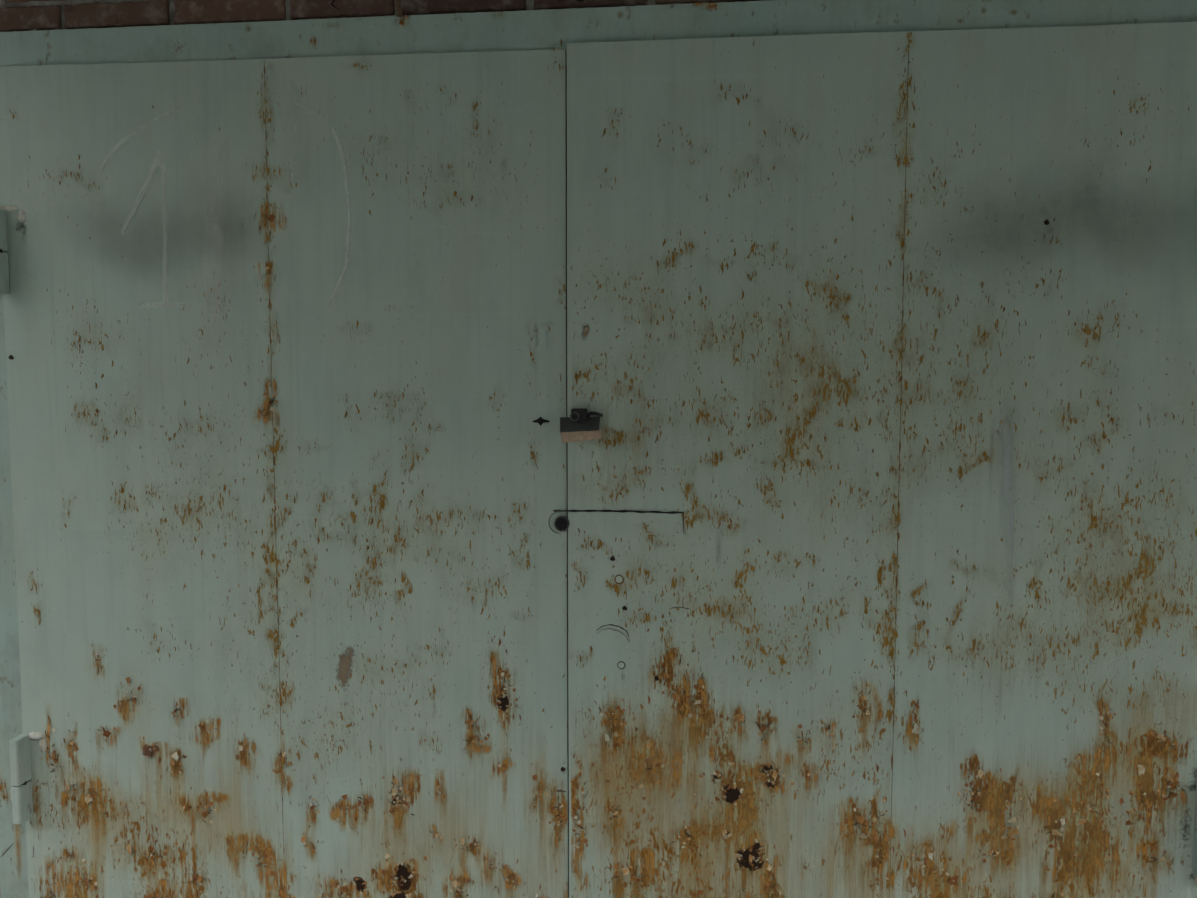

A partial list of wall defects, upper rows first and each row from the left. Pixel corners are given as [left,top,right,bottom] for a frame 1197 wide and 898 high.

corrosion [238,77,298,363]
corrosion [526,32,1197,898]